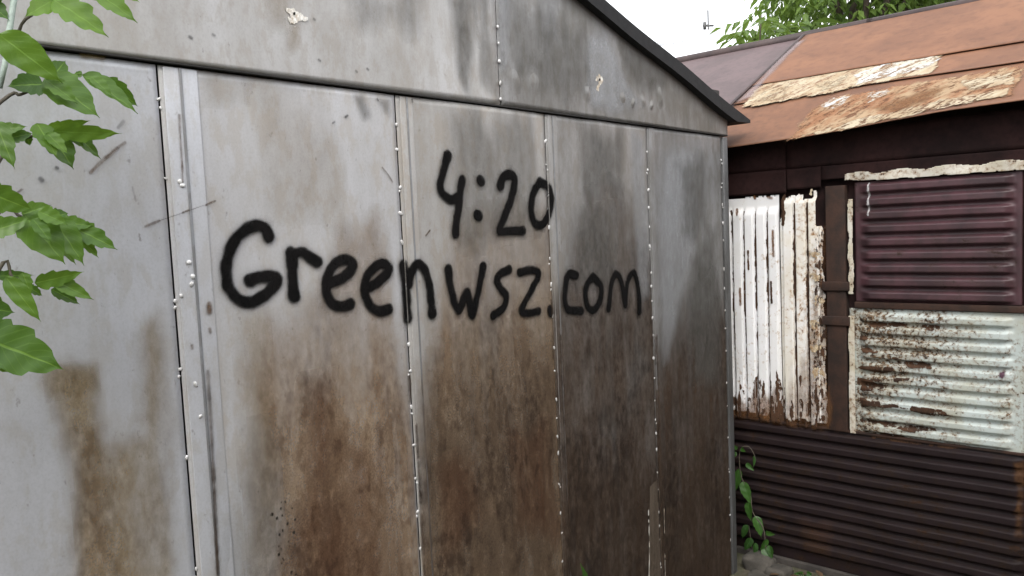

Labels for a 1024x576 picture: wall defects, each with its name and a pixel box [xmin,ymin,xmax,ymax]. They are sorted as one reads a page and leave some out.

peeling [742,55,1023,139]
rust [56,372,160,576]
rust [260,194,833,576]
peeling [809,226,827,421]
peeling [857,322,958,449]